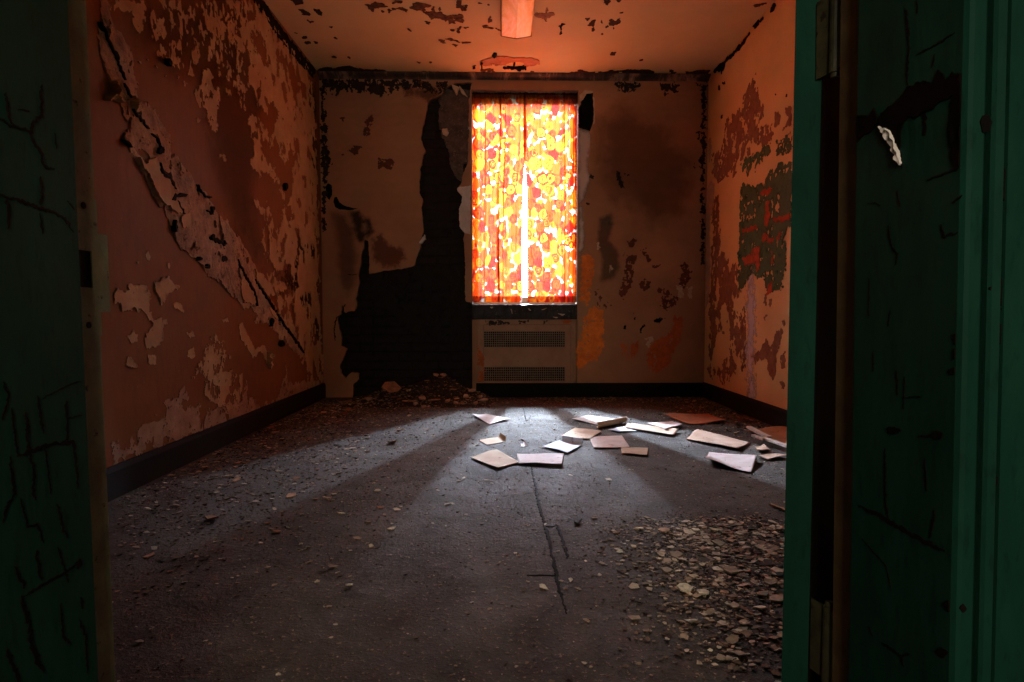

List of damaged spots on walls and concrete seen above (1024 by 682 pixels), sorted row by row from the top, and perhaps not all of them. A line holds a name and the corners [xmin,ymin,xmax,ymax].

crack [97,22,305,353]
flaking render [107,0,501,465]
peeling [472,52,540,73]
peeling [534,7,565,35]
peeling [561,0,793,389]
crack [527,453,569,614]